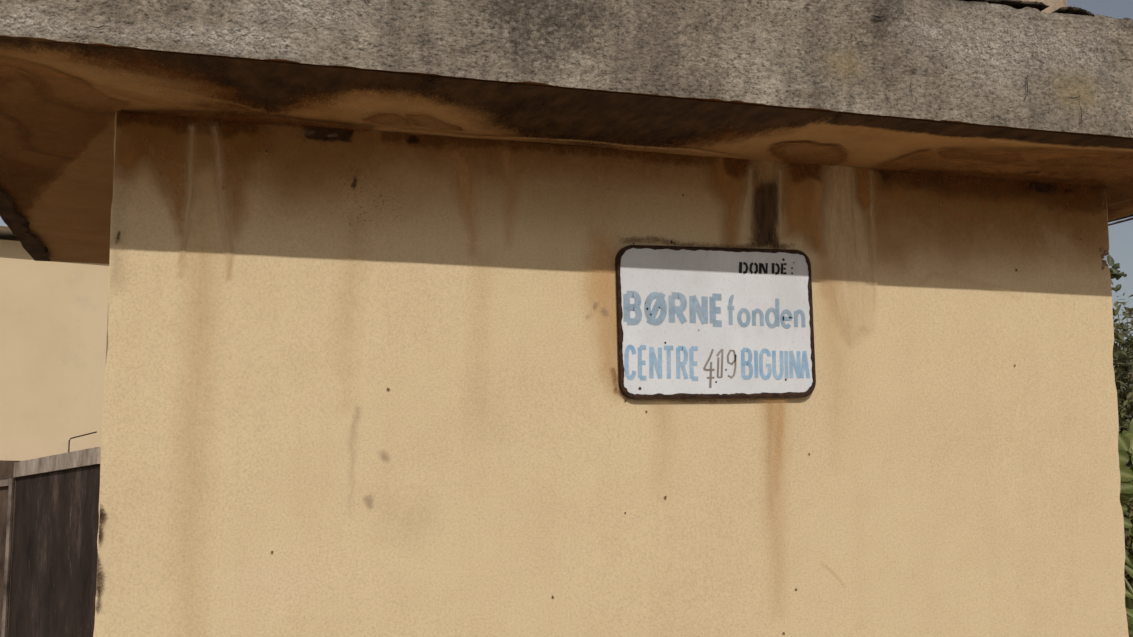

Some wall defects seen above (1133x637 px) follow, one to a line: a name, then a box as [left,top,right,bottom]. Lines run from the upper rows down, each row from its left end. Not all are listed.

leakage [0,0,1133,338]